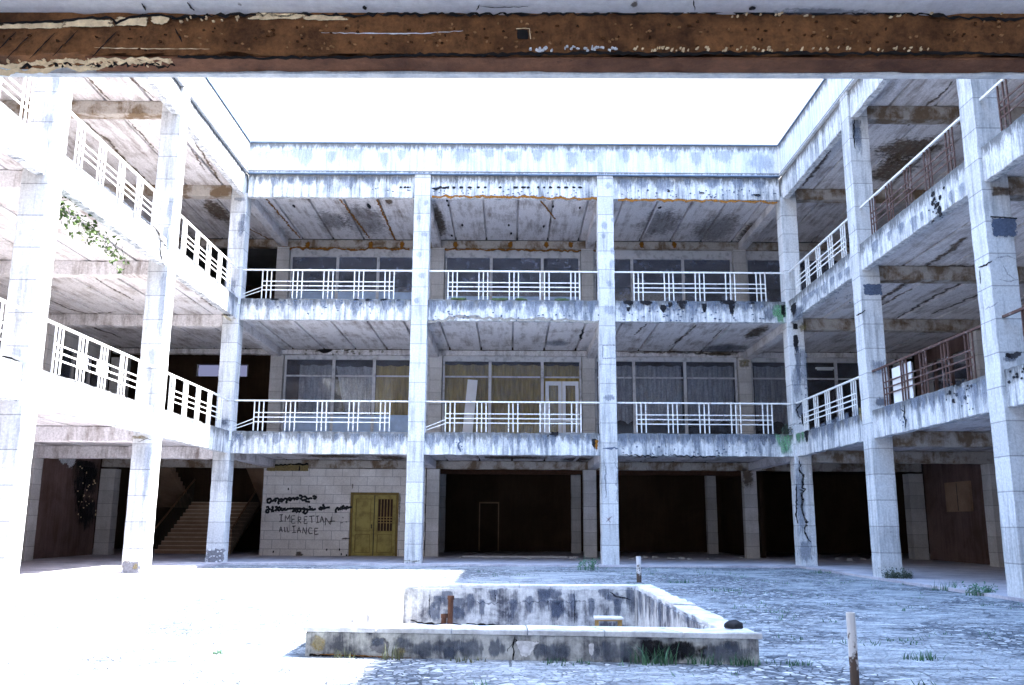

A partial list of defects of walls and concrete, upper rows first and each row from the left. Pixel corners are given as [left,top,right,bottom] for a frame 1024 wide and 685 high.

spalling [0,13,372,76]
leakage [852,120,943,181]
rust [266,199,410,251]
rust [432,194,597,219]
rust [445,242,596,253]
spalling [928,186,945,223]
peeling [990,216,1018,237]
peeling [863,284,882,295]
leakage [617,335,862,452]
crack [795,461,811,542]
crack [411,595,517,660]
leakage [427,587,695,626]